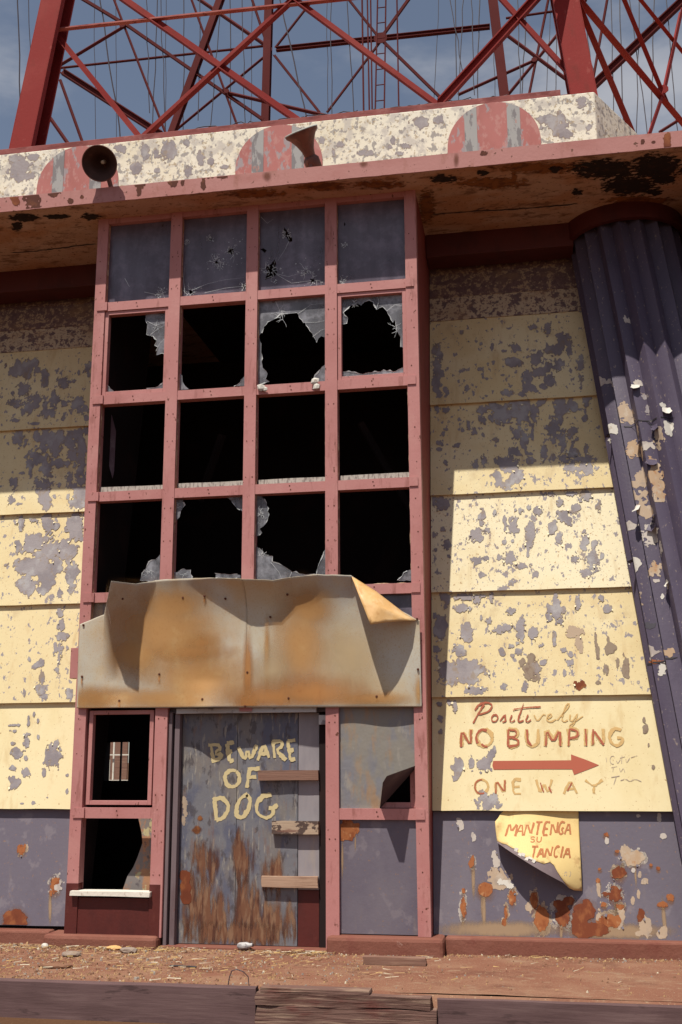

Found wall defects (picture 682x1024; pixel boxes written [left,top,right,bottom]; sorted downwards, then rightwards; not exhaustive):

peeling [113,139,229,196]
leakage [548,151,682,197]
peeling [4,357,92,701]
peeling [436,322,604,586]
peeling [606,379,674,599]
rust [78,589,397,707]
peeling [433,592,630,734]
peeling [649,645,675,676]
rust [3,909,28,925]
rust [179,816,296,945]
rust [340,820,360,873]
rust [451,882,658,938]